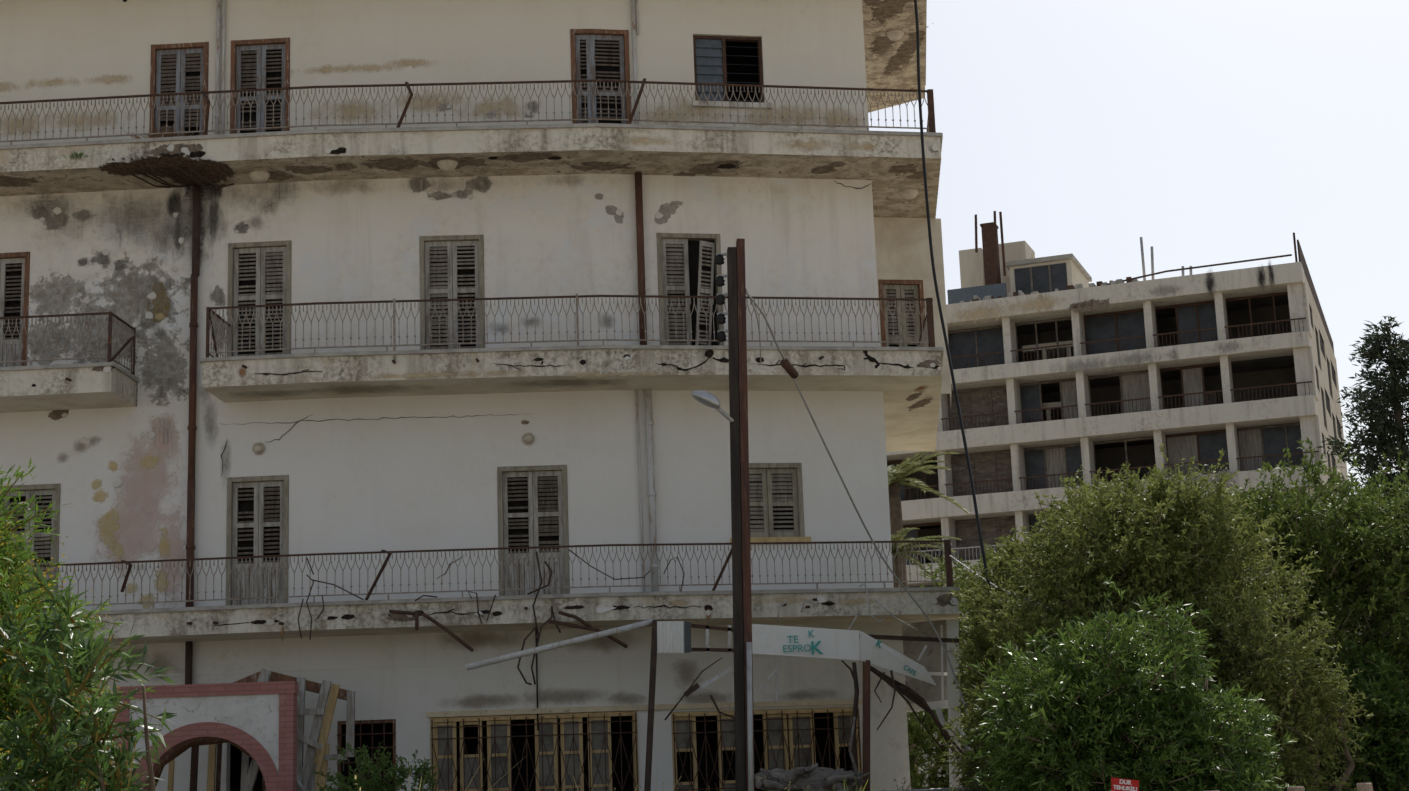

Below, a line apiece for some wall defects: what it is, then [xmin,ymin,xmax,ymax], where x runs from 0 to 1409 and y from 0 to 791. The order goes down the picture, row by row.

peeling [209,286,225,350]
peeling [0,176,191,609]
crack [254,368,323,376]
crack [494,362,563,370]
crack [656,346,914,371]
crack [221,414,519,476]